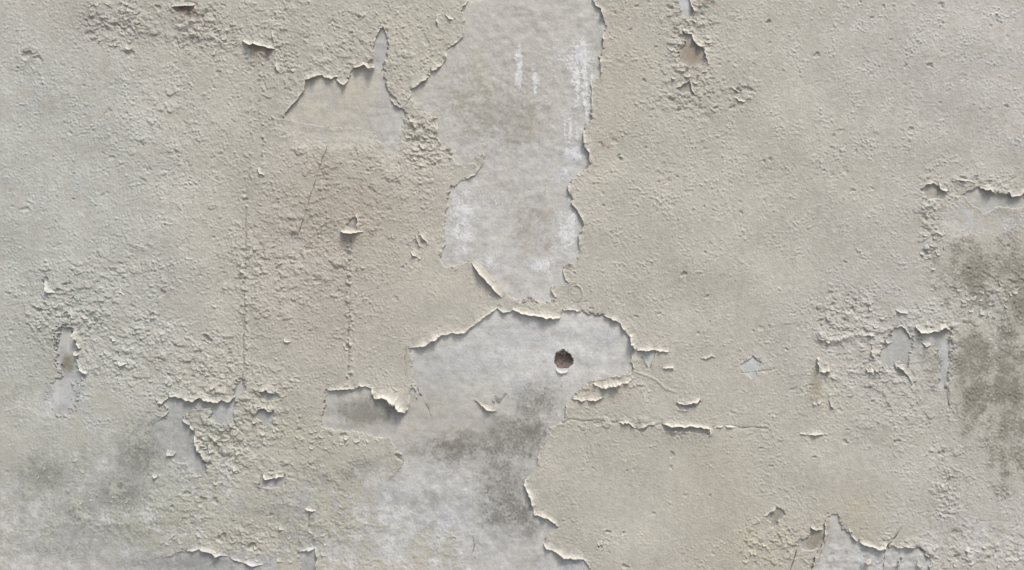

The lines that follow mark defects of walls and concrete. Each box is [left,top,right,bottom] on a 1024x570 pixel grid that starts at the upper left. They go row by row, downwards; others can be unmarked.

peeling [668,0,716,96]
peeling [922,177,1024,213]
peeling [34,275,103,421]
peeling [144,366,290,485]
peeling [171,0,675,570]
peeling [816,292,955,390]
damp [954,326,1024,476]
peeling [796,513,931,570]